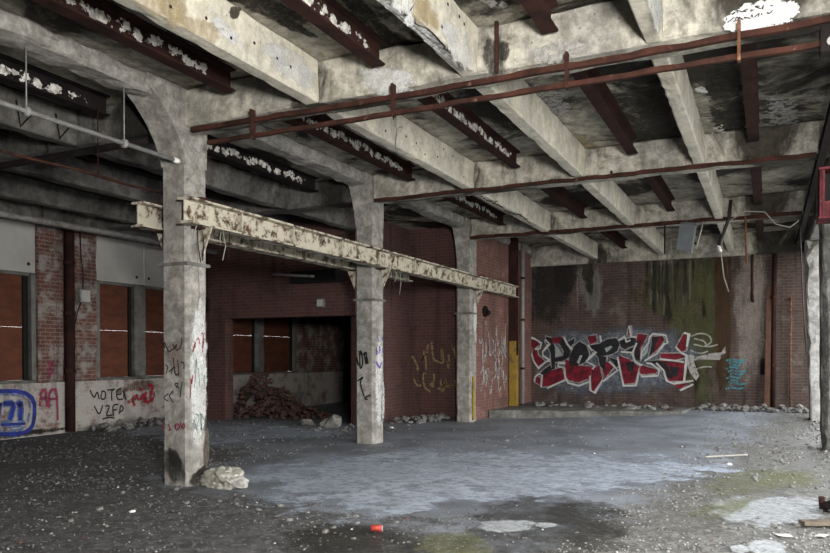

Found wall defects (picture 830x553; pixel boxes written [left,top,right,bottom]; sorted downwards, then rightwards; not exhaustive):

spalling [377,0,464,70]
damp [705,62,746,132]
damp [531,264,593,324]
damp [646,259,694,319]